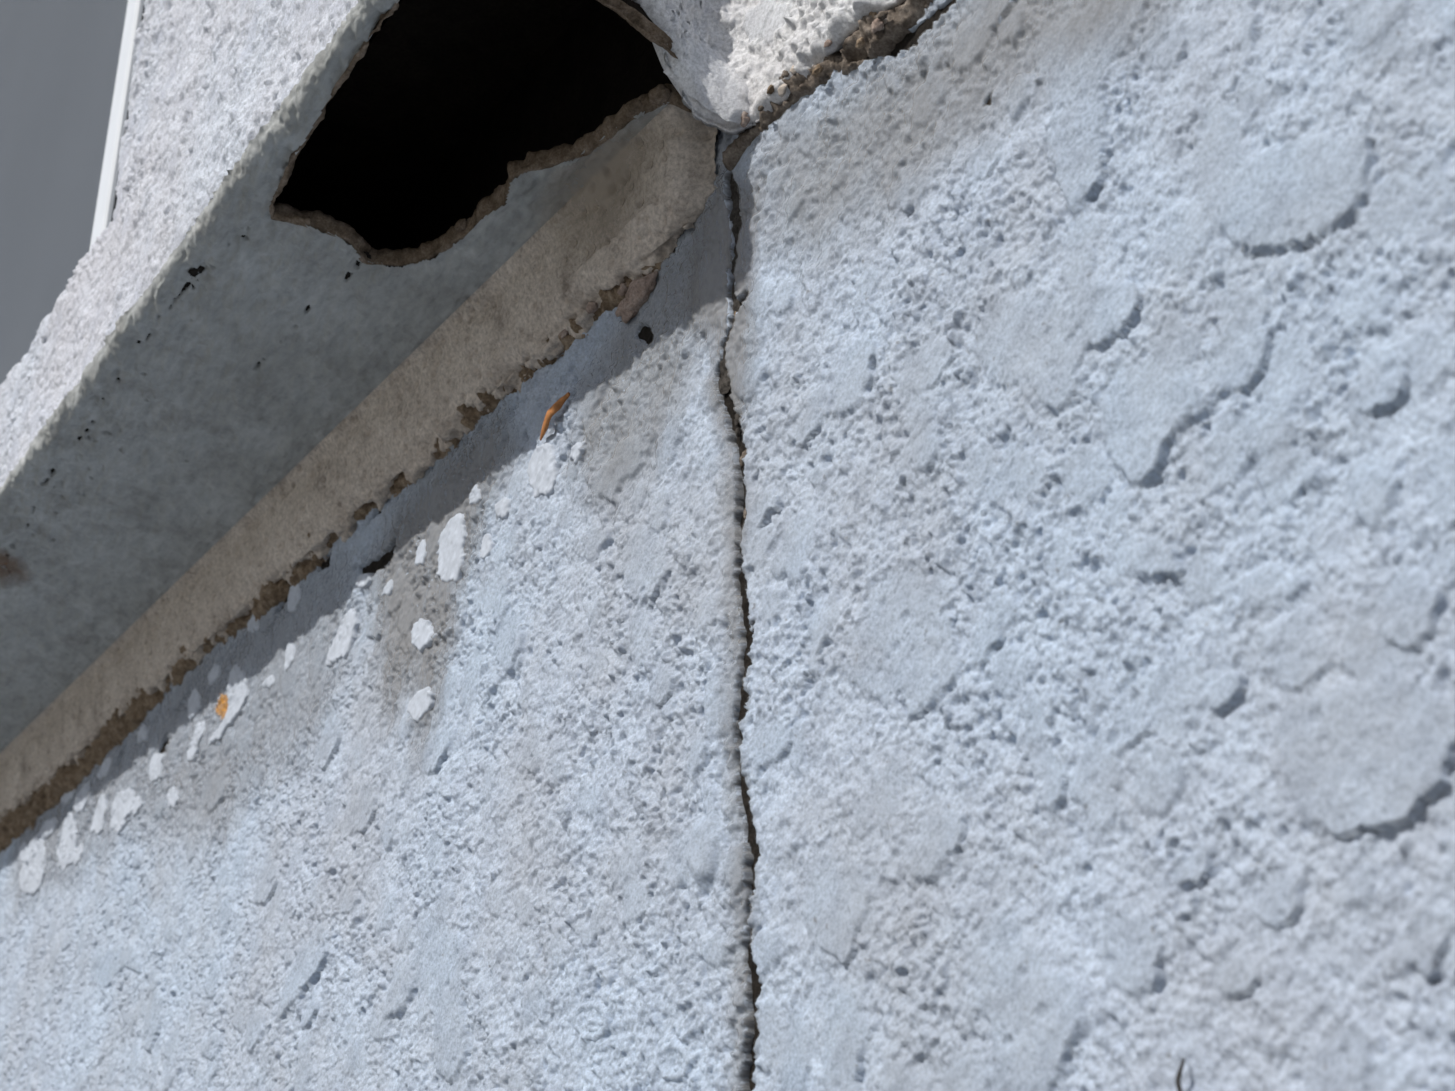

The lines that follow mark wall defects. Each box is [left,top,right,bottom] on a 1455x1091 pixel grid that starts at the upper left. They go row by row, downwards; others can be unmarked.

hole [269,0,692,267]
crack [891,0,956,57]
crack [718,173,762,1091]